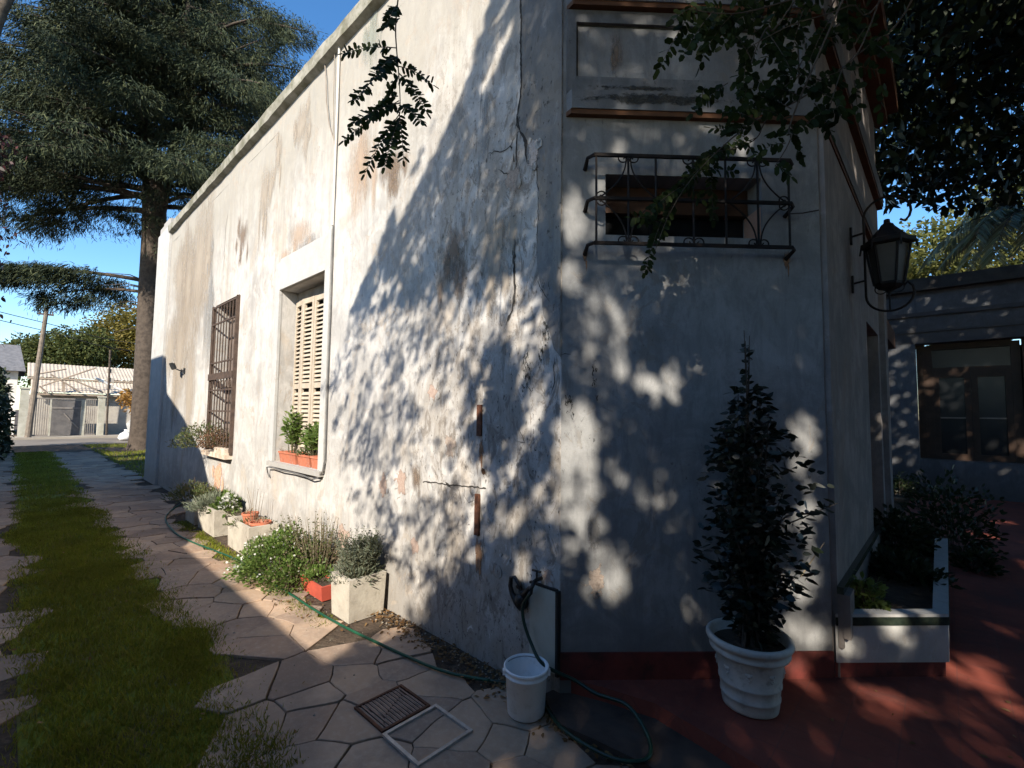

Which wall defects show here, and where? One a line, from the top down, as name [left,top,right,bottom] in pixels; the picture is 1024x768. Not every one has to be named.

damp [581,85,719,105]
damp [235,134,281,261]
crack [490,0,550,324]